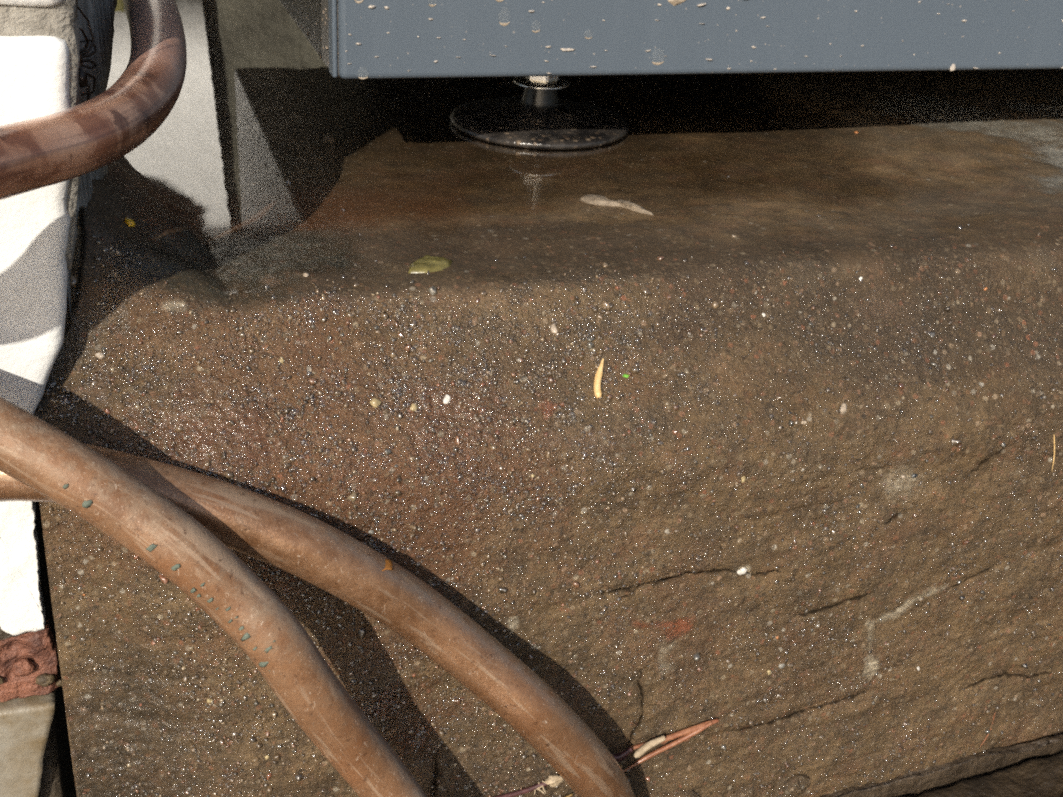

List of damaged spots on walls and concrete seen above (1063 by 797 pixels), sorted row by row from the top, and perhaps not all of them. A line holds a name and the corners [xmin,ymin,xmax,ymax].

leakage [877,94,1063,193]
crack [596,542,778,597]
crack [799,594,868,616]
leakage [867,589,938,633]
leakage [864,658,878,677]